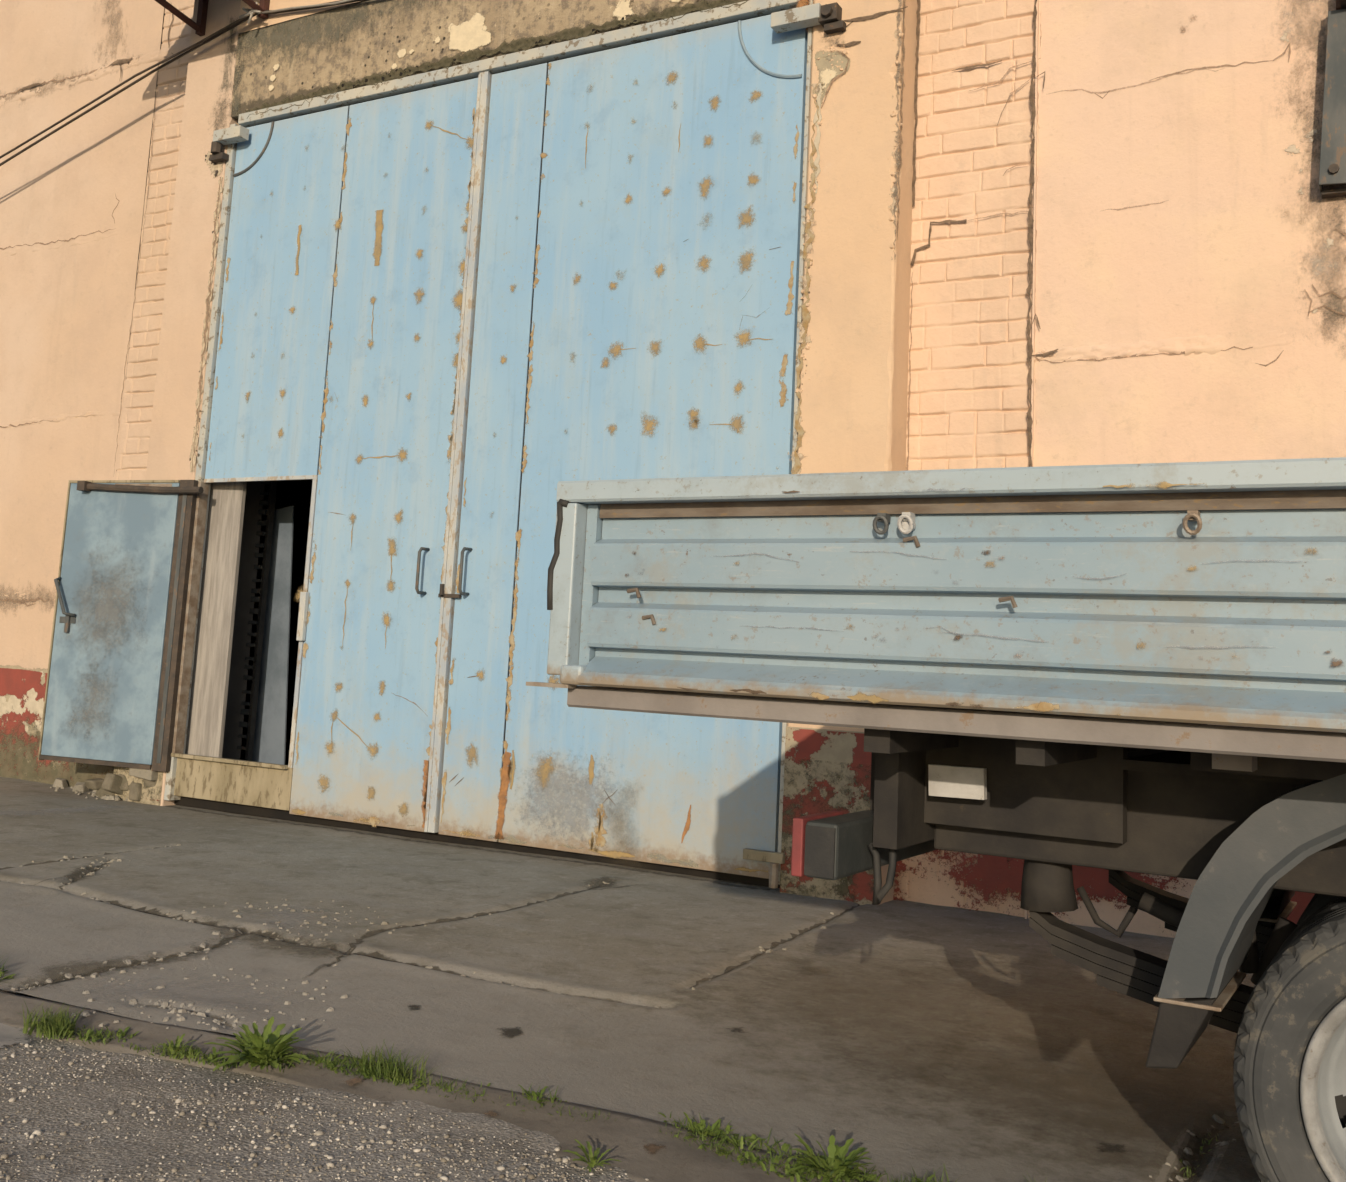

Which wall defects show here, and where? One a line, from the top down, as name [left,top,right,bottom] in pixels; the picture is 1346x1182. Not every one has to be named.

peeling [391,48,415,69]
peeling [435,12,494,52]
peeling [612,0,636,21]
crack [1149,60,1272,81]
damp [1273,0,1327,101]
spalling [887,0,905,260]
crack [835,0,1045,471]
damp [1298,169,1346,333]
crack [0,591,53,607]
peeling [0,665,163,806]
crack [0,844,860,1030]